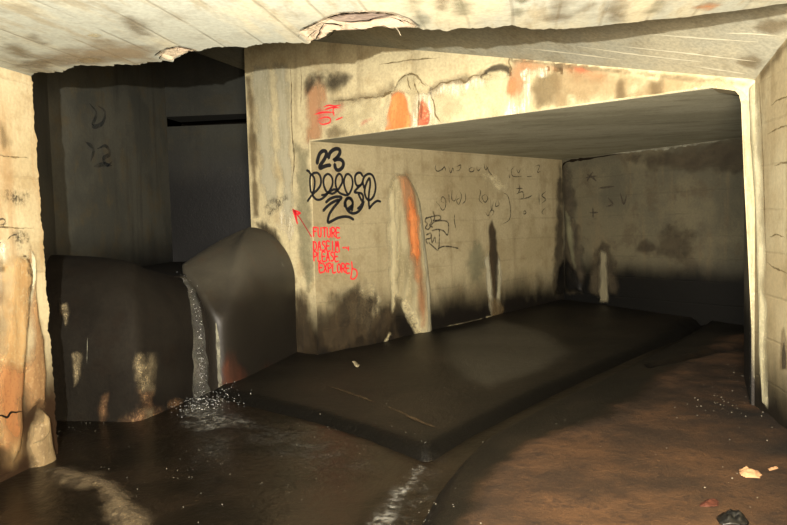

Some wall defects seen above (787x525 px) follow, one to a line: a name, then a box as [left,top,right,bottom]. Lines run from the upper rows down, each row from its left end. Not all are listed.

spalling [298,11,417,41]
spalling [155,47,196,60]
crack [335,91,393,101]
rust [380,90,443,132]
crack [430,75,479,91]
leakage [295,175,431,353]